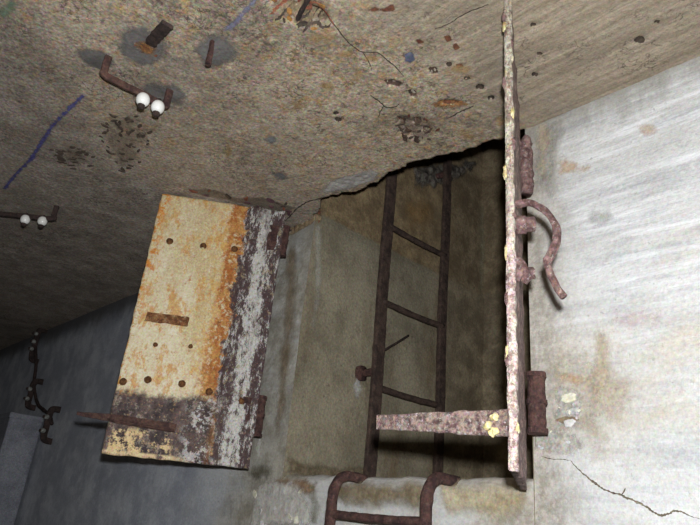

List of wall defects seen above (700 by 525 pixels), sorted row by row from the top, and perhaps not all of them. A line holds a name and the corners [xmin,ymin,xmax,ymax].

crack [330,20,402,74]
peeling [50,146,95,170]
peeling [99,113,152,173]
spalling [395,114,440,143]
spalling [414,160,476,188]
crack [285,196,328,221]
flaking render [535,387,582,454]
crack [541,456,699,519]